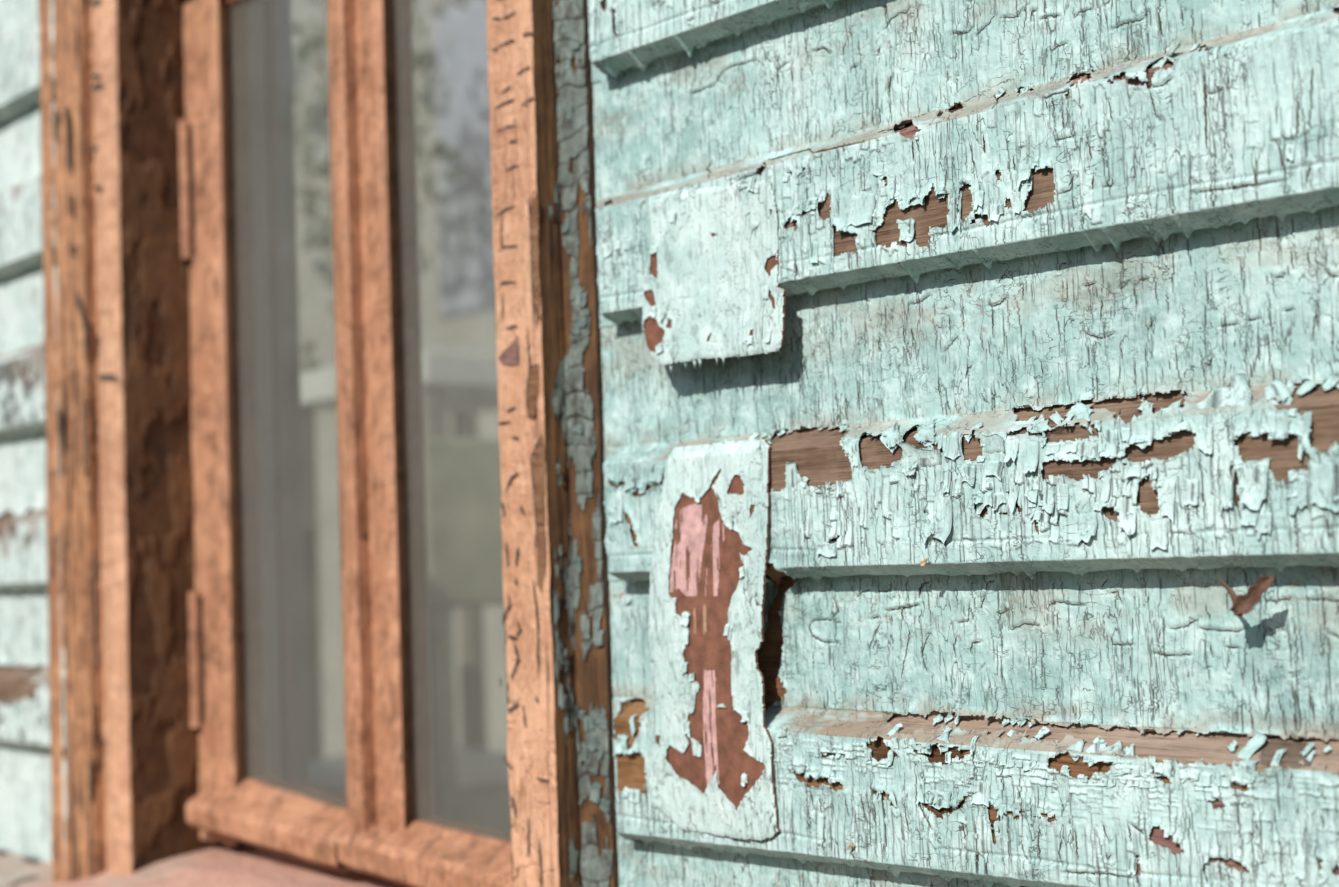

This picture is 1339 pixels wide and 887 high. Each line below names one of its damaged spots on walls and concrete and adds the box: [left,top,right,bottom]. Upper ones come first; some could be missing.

crack [954,0,1149,51]
peeling [1065,41,1220,99]
crack [706,105,957,189]
crack [1043,90,1114,209]
crack [1149,68,1313,193]
peeling [769,160,1056,263]
peeling [498,0,665,887]
peeling [749,373,1339,550]
peeling [656,469,800,810]
crack [807,579,1122,677]
peeling [865,710,1339,845]
crack [1021,822,1144,878]